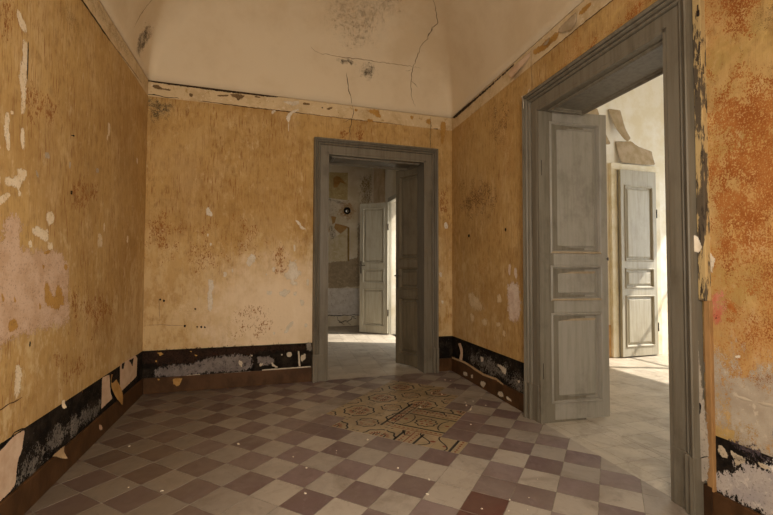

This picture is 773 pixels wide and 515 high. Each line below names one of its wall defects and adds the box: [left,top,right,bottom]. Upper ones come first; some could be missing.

peeling [533,32,559,55]
peeling [0,9,29,151]
peeling [0,168,39,205]
flaking render [0,211,71,350]
peeling [142,322,312,380]
peeling [14,365,22,400]
flaking render [698,336,773,482]